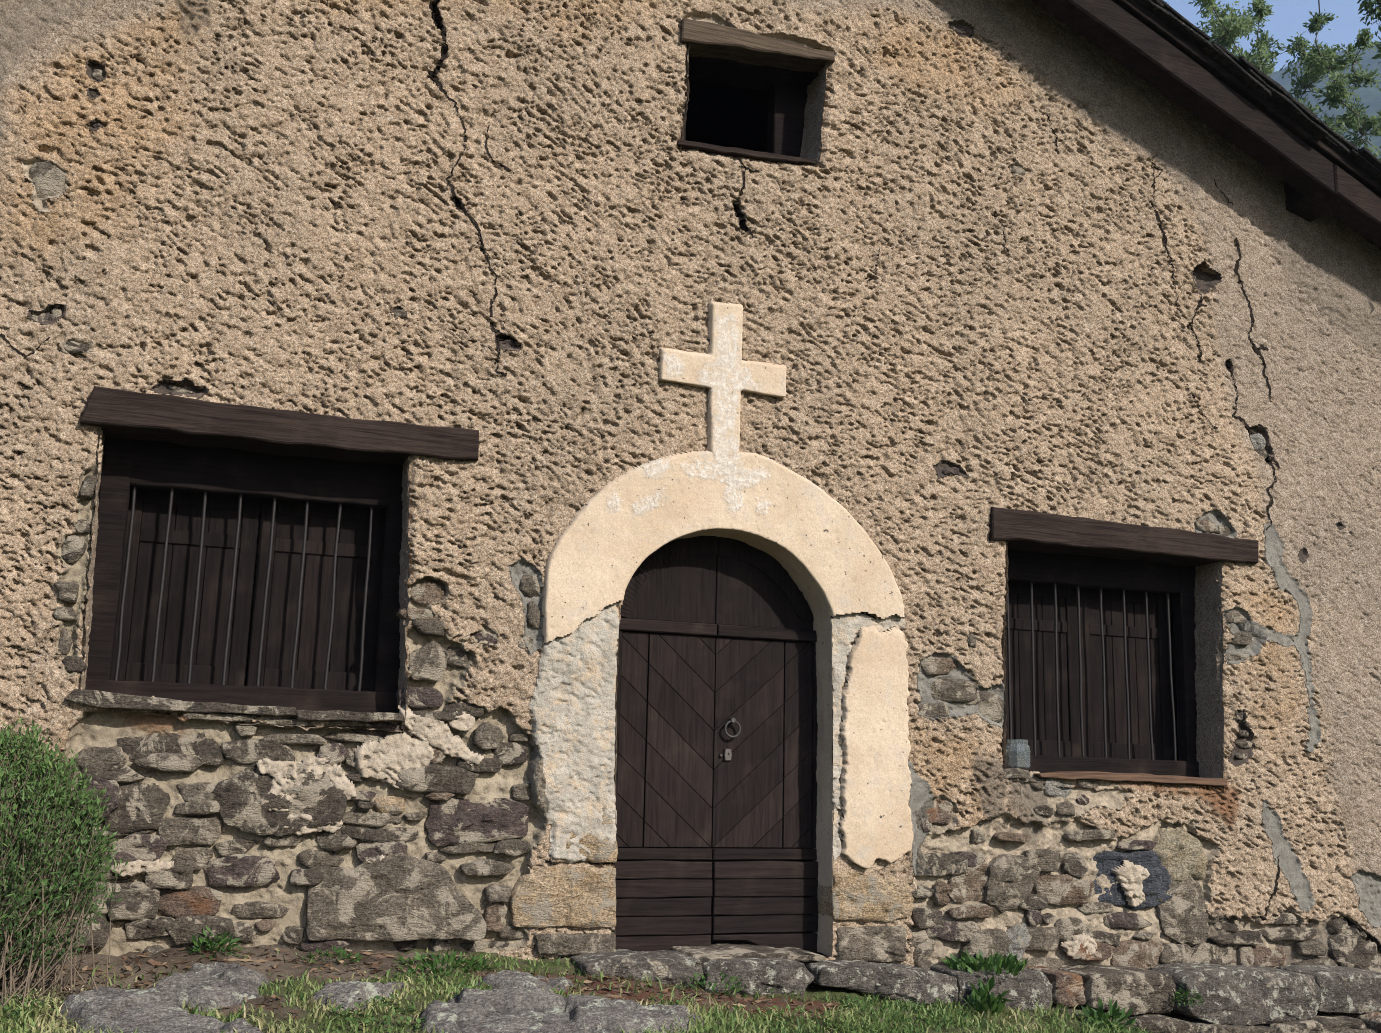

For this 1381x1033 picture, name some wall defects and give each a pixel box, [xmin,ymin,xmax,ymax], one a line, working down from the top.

crack [427,0,521,375]
crack [734,159,762,238]
flaking render [1191,261,1222,294]
crack [1151,160,1280,530]
flaking render [52,462,99,680]
flaking render [1298,547,1309,564]
flaking render [967,632,978,650]
flaking render [1222,606,1268,665]
flaking render [917,652,1005,728]
flaking render [4,557,619,959]
flaking render [1228,709,1256,766]
flaking render [906,771,1381,972]